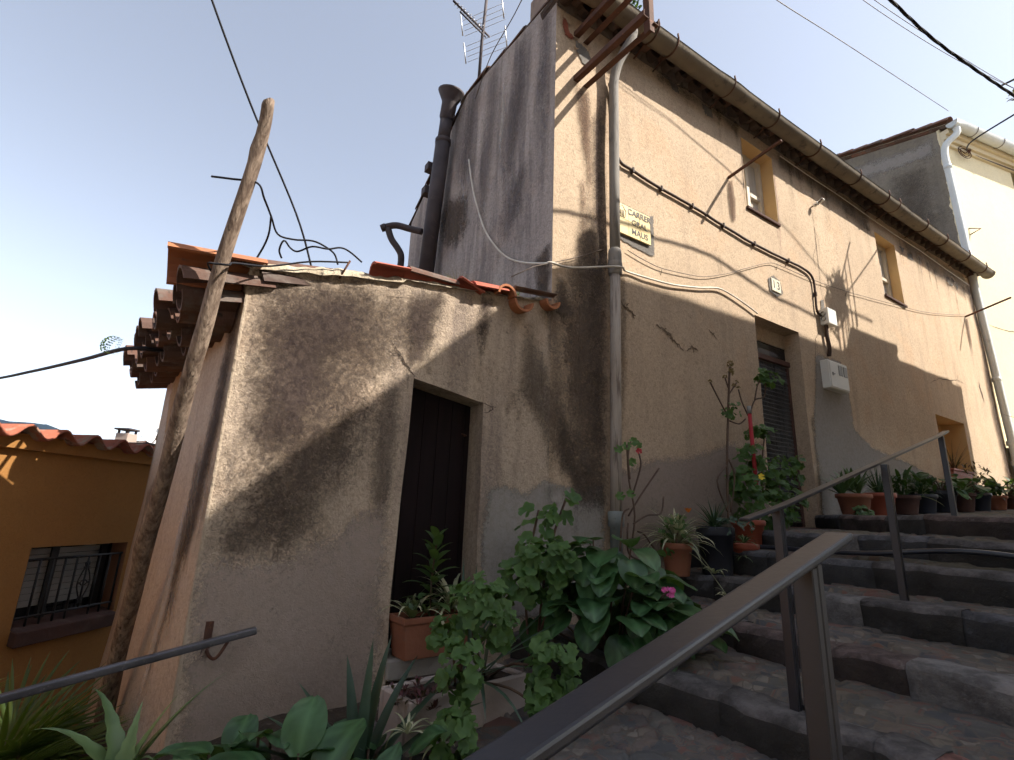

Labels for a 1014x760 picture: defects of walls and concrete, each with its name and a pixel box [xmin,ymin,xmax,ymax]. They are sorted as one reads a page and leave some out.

water stain [150,281,444,653]
water stain [440,196,467,246]
water stain [521,104,607,508]